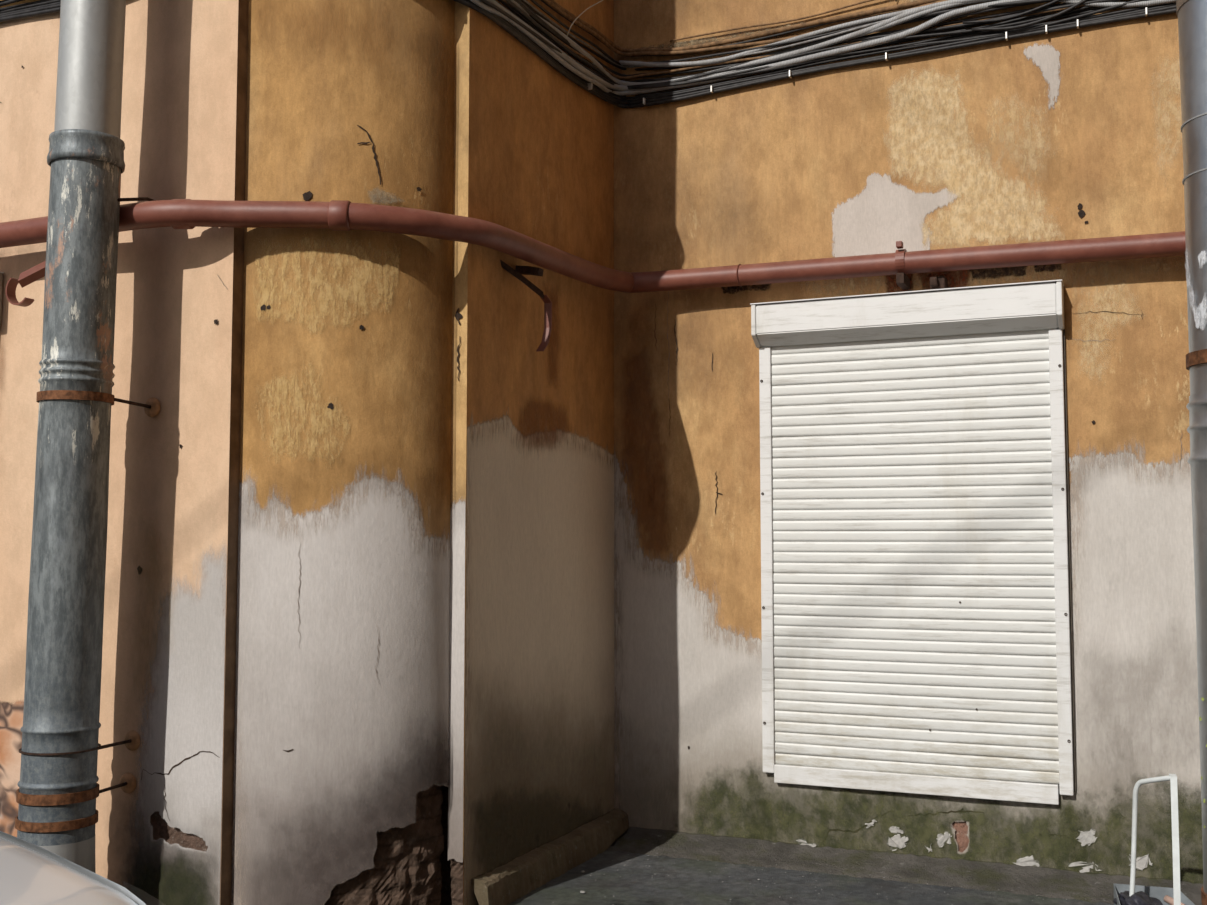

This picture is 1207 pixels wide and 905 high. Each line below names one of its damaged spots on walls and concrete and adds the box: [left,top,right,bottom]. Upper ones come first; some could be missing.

peeling [1023,43,1061,108]
peeling [831,71,1065,257]
peeling [258,366,350,463]
peeling [131,412,1201,905]
crack [141,751,220,819]